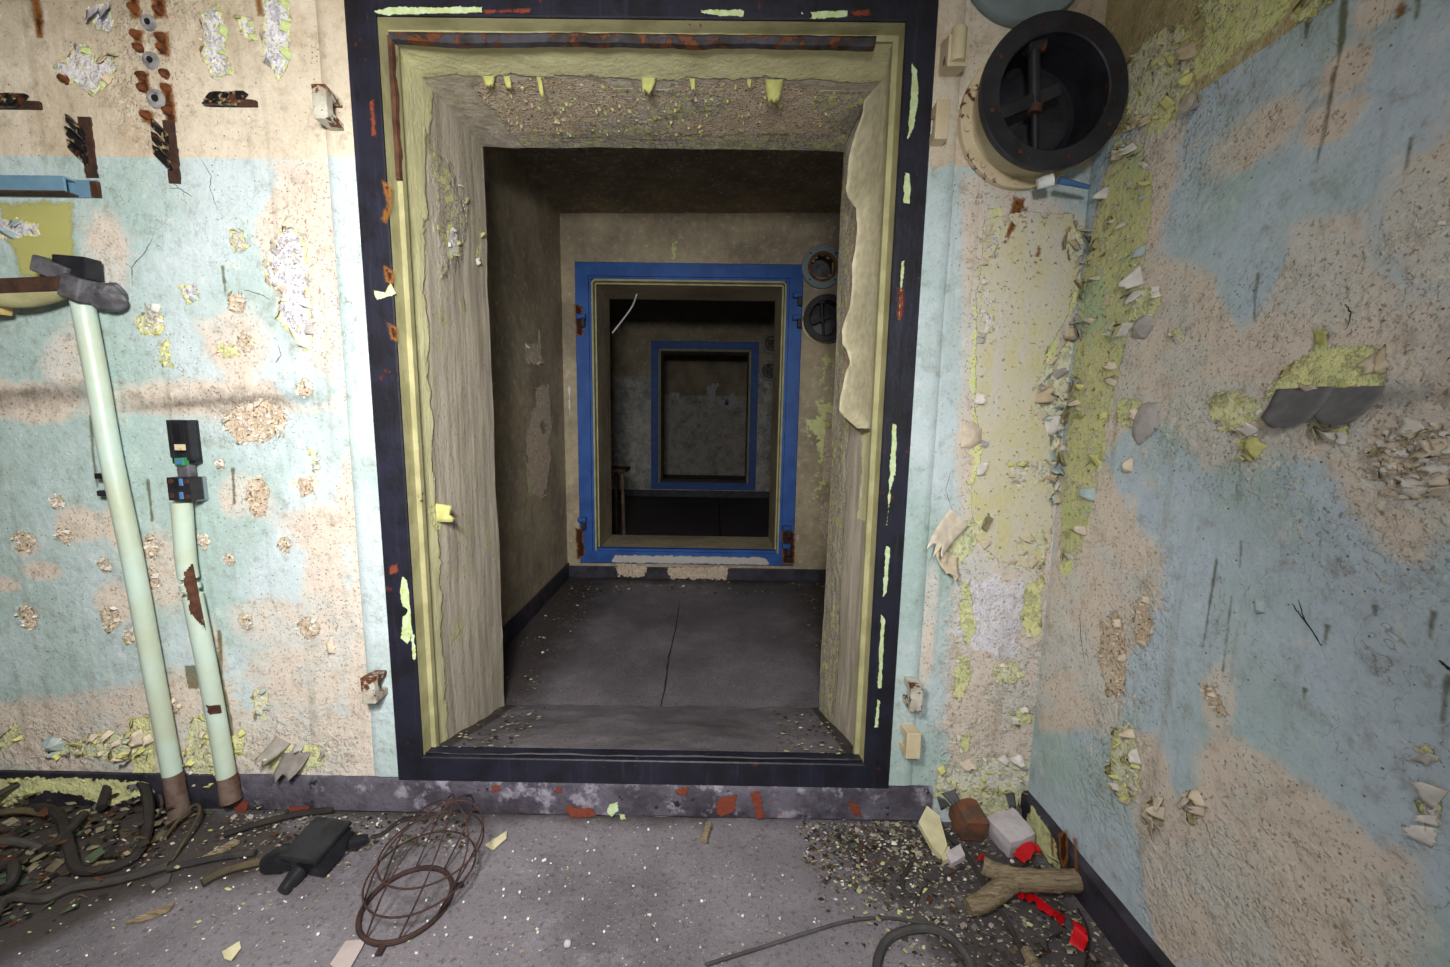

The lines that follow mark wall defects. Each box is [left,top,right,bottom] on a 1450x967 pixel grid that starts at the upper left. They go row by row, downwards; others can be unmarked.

rust [31,0,44,38]
rust [129,0,170,56]
rust [138,73,176,125]
peeling [261,215,316,353]
peeling [220,398,289,445]
peeling [926,0,1238,703]
peeling [1206,326,1391,464]
peeling [1364,416,1450,505]
peeling [0,714,157,811]
peeling [170,696,215,789]
peeling [231,688,327,783]
peeling [1104,724,1208,841]